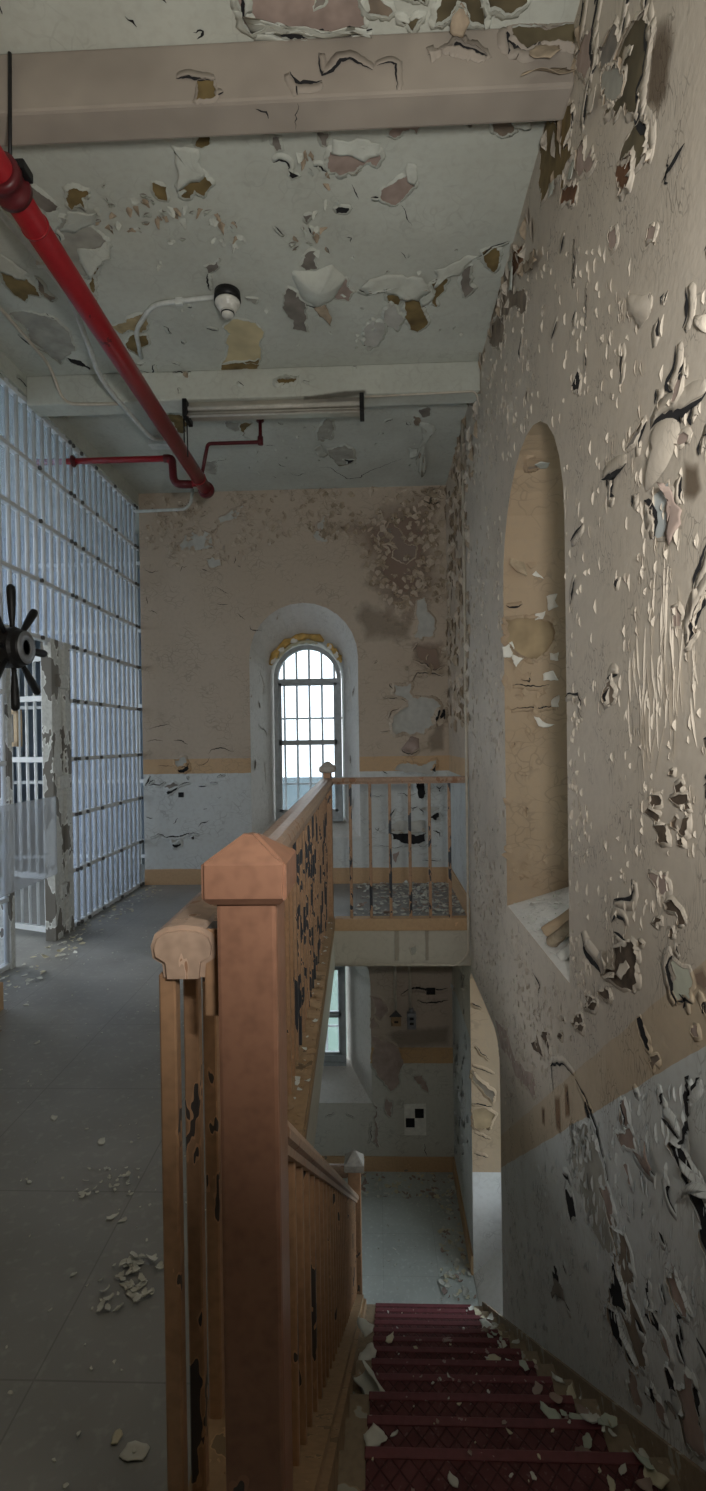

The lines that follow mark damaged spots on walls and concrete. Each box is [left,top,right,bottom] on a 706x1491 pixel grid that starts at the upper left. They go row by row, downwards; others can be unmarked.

peeling [176,69,223,106]
crack [256,50,404,129]
peeling [30,137,243,301]
peeling [0,254,92,370]
peeling [111,310,191,394]
peeling [207,296,265,388]
leakage [370,492,438,601]
peeling [230,0,706,1158]
peeling [353,1317,394,1394]
peeling [364,1423,398,1446]
peeling [540,1371,582,1419]
peeling [448,1471,459,1488]